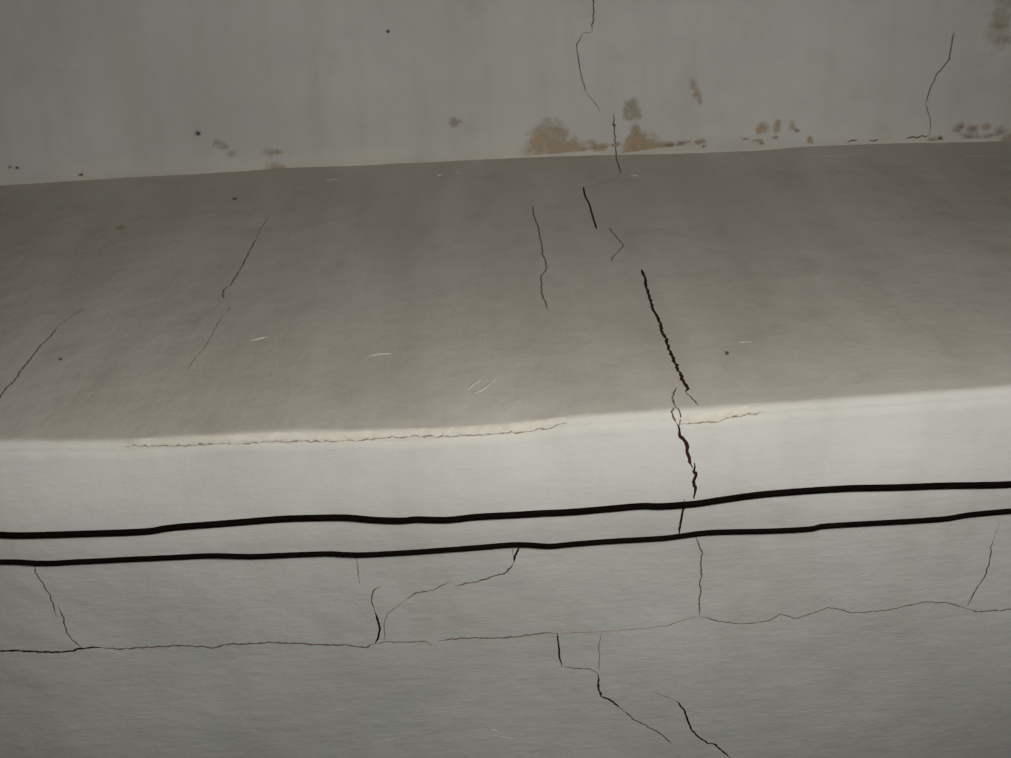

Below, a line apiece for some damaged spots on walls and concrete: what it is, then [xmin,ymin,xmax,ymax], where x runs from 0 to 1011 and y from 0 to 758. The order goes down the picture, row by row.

crack [532,205,548,310]
crack [576,0,624,260]
crack [906,33,954,139]
crack [0,269,1011,758]